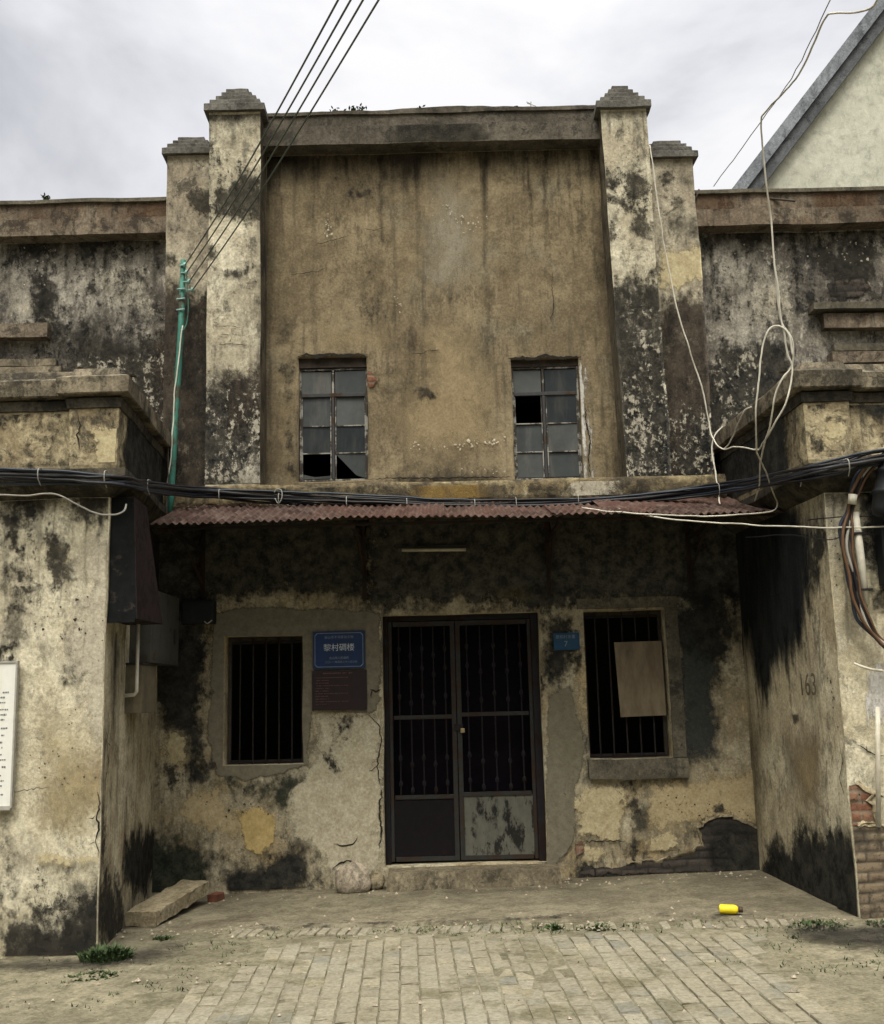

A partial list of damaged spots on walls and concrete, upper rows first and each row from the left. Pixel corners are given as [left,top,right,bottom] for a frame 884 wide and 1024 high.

damp [605,149,675,240]
damp [0,240,287,504]
damp [613,231,884,498]
damp [0,498,116,747]
damp [150,493,839,796]
crack [89,715,110,856]
damp [0,826,321,969]
peeling [173,714,384,877]
crack [332,689,383,870]
peeling [564,768,758,876]
damp [710,804,884,947]
flaking render [849,781,884,919]